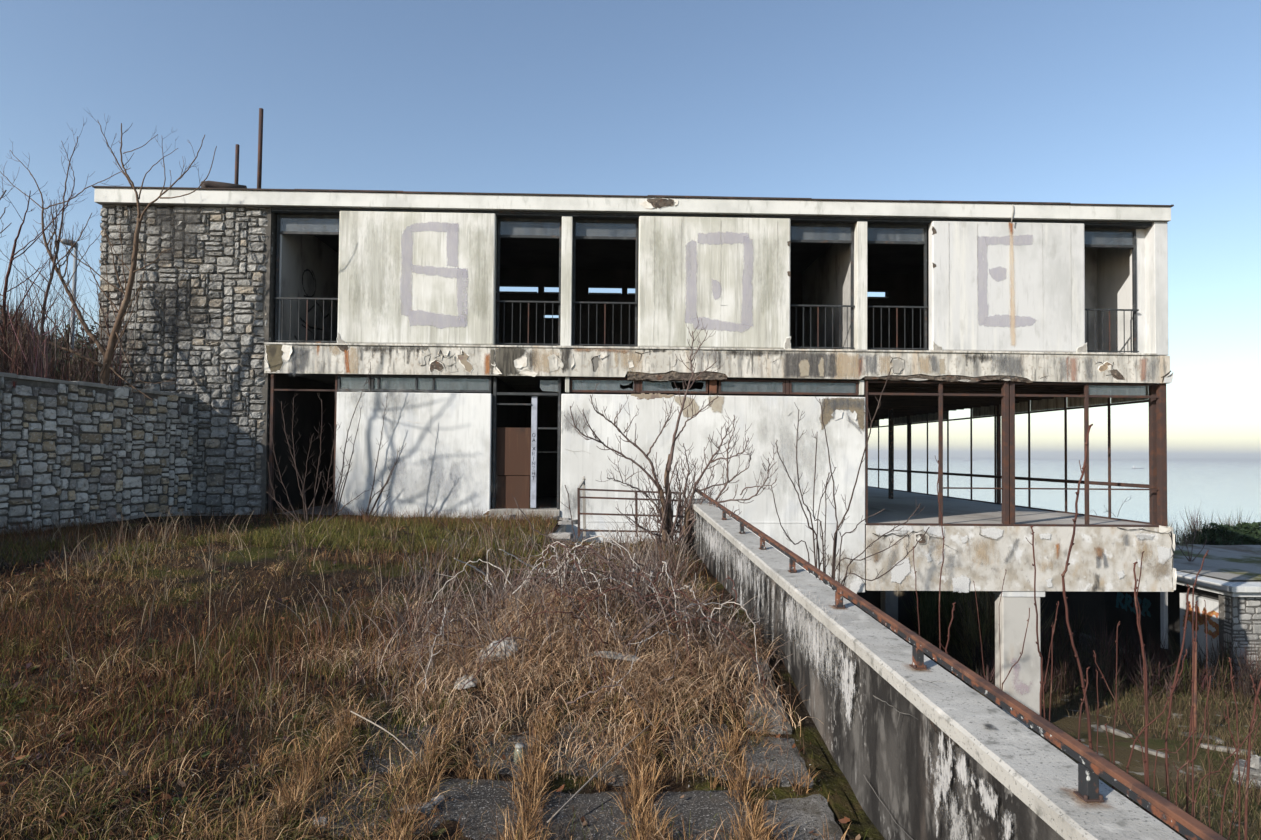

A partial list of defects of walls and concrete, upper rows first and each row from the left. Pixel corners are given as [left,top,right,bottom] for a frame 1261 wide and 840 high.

peeling [264,342,292,374]
spalling [336,332,358,373]
peeling [418,349,473,374]
peeling [490,347,537,377]
peeling [591,354,609,372]
spalling [865,374,1033,383]
peeling [1076,343,1125,380]
peeling [820,397,865,430]
spalling [914,532,927,545]
rust [1094,547,1107,567]
leakage [691,511,856,724]
leakage [930,732,1013,840]